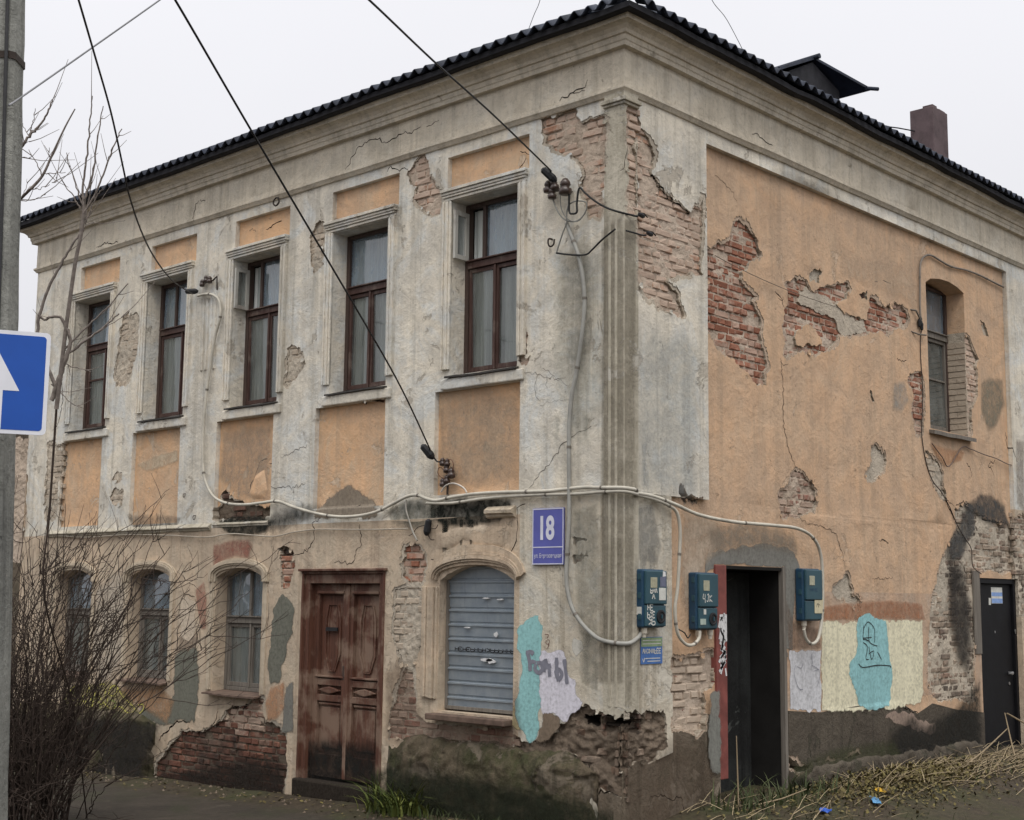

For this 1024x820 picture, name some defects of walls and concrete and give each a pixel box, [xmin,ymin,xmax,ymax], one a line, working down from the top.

crack [346,120,439,172]
spalling [407,154,442,218]
spalling [540,108,611,222]
spalling [624,106,771,386]
spalling [113,311,140,387]
spalling [283,344,306,389]
spalling [782,267,910,361]
spalling [777,467,819,521]
leakage [968,495,1008,523]
spalling [925,450,1024,704]
spalling [387,541,715,803]
spalling [154,695,289,794]